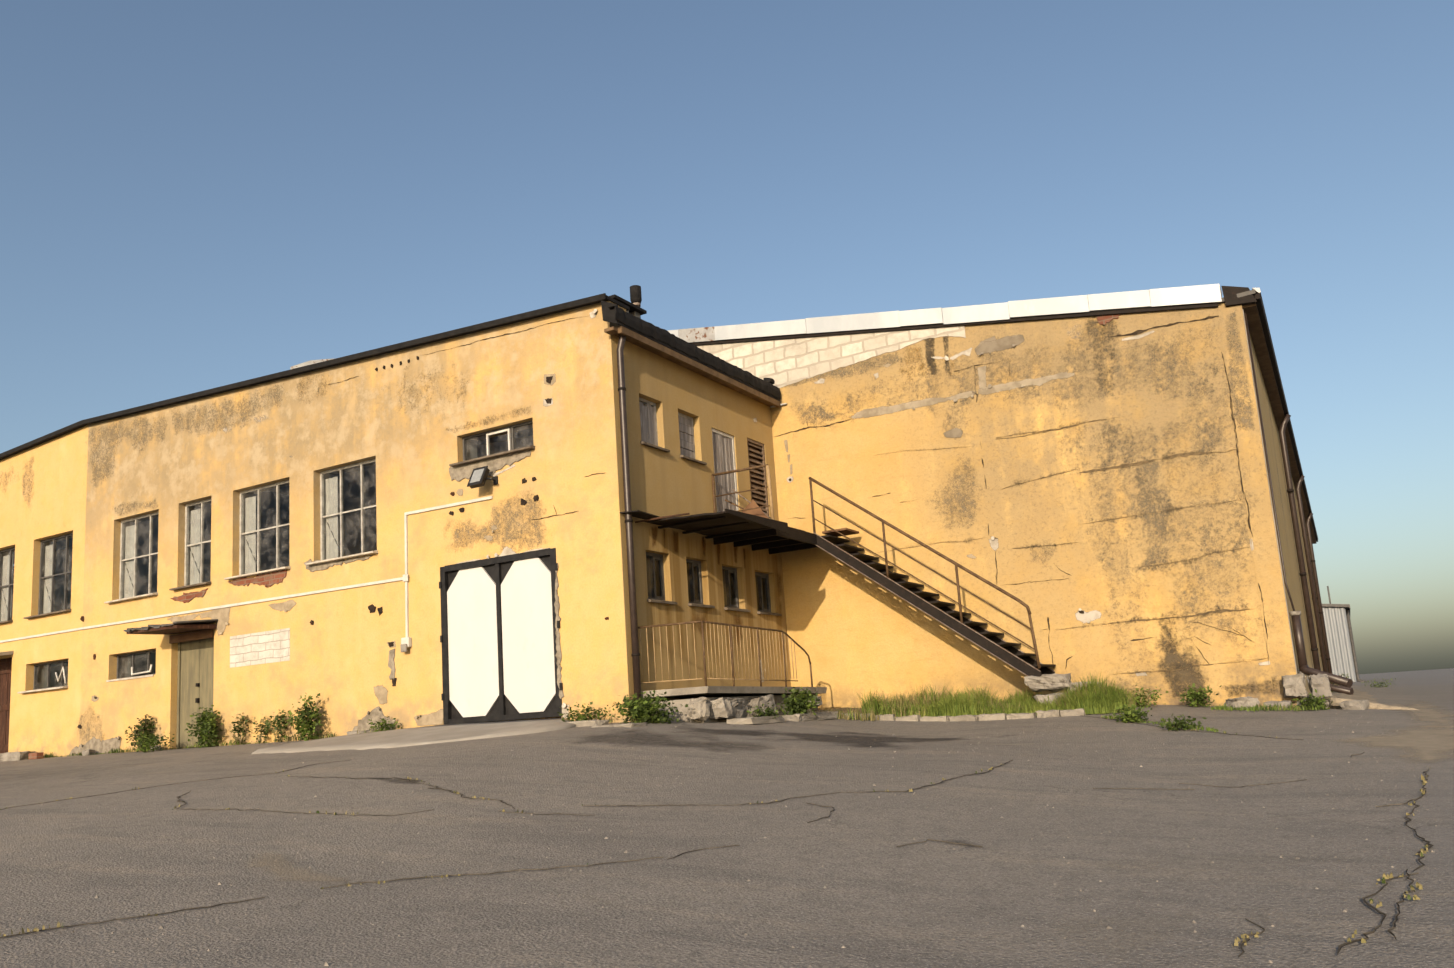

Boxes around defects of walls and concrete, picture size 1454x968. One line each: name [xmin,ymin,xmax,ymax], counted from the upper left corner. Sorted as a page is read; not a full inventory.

crack [1110,316,1217,337]
damp [792,336,1044,424]
spalling [851,335,1075,419]
damp [455,494,542,546]
crack [775,414,851,437]
spalling [943,428,963,438]
damp [939,460,976,524]
crack [874,352,1253,585]
damp [1063,313,1253,701]
crack [1044,583,1270,674]